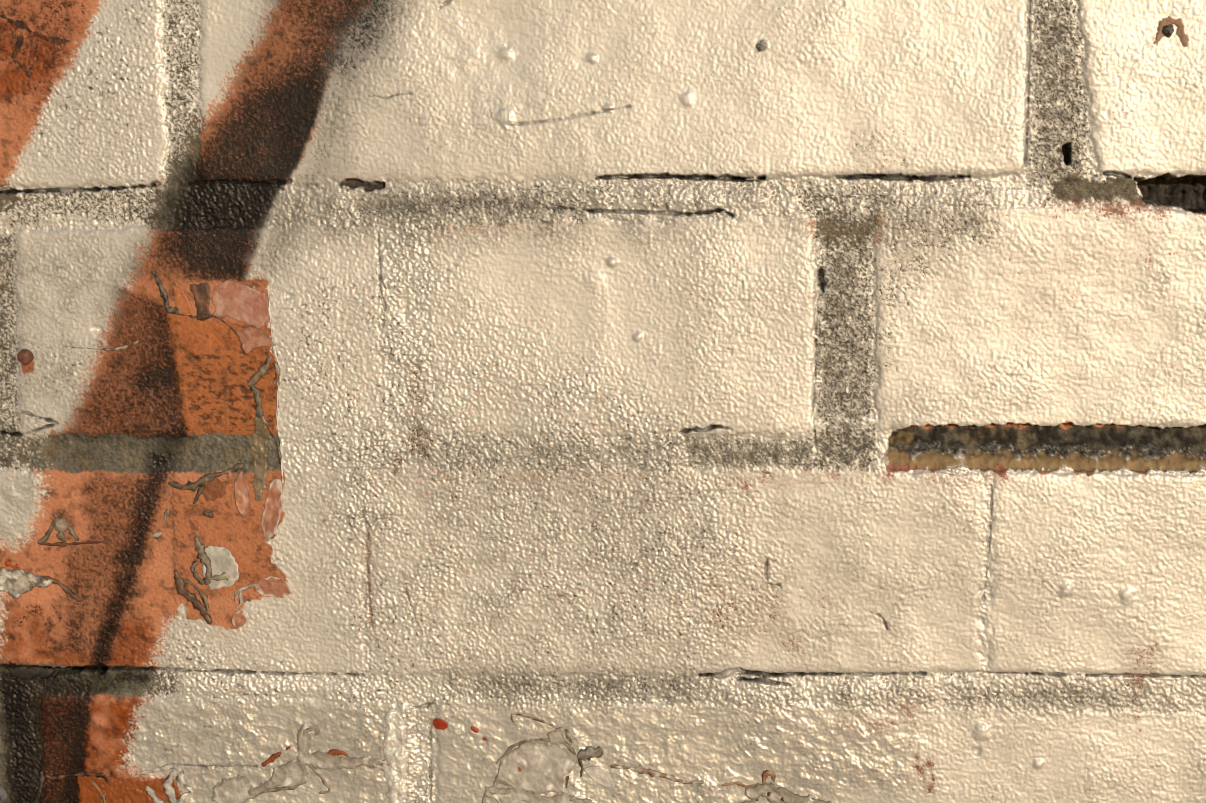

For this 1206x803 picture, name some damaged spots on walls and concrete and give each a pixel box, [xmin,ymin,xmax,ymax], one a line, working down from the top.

spalling [12,36,23,58]
peeling [64,339,144,351]
peeling [152,270,292,629]
peeling [31,763,193,803]